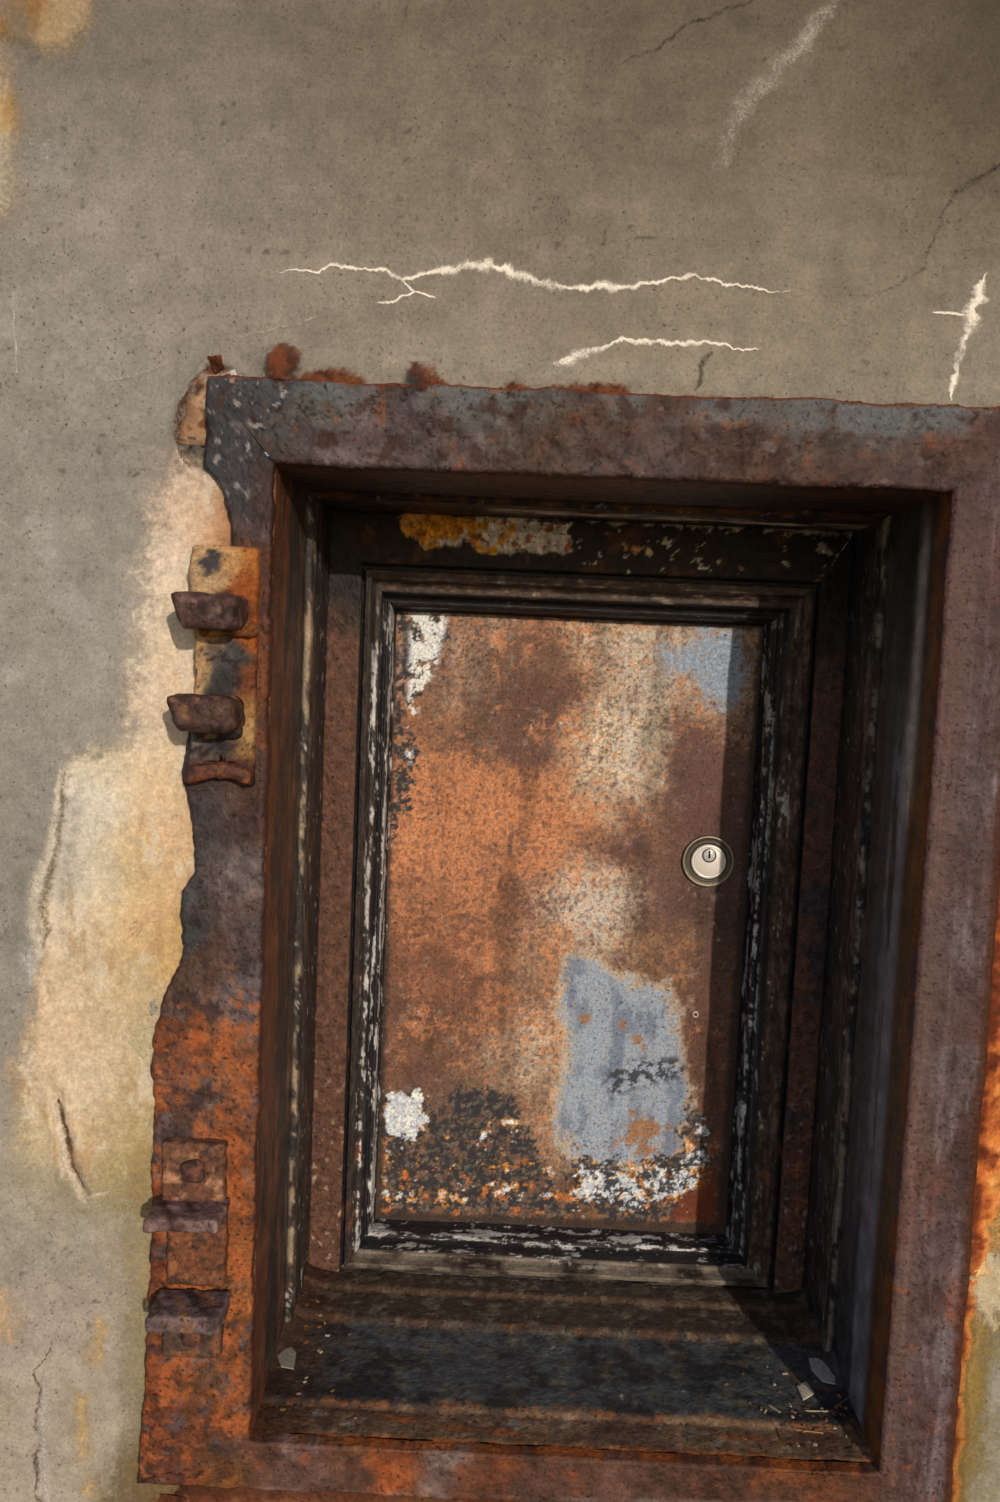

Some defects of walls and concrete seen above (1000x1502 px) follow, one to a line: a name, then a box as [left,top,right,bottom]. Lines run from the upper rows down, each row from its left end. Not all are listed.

corrosion [265,342,365,383]
corrosion [408,361,449,390]
corrosion [506,381,532,389]
corrosion [551,382,631,393]
crack [50,1097,109,1204]
crack [33,1336,52,1502]